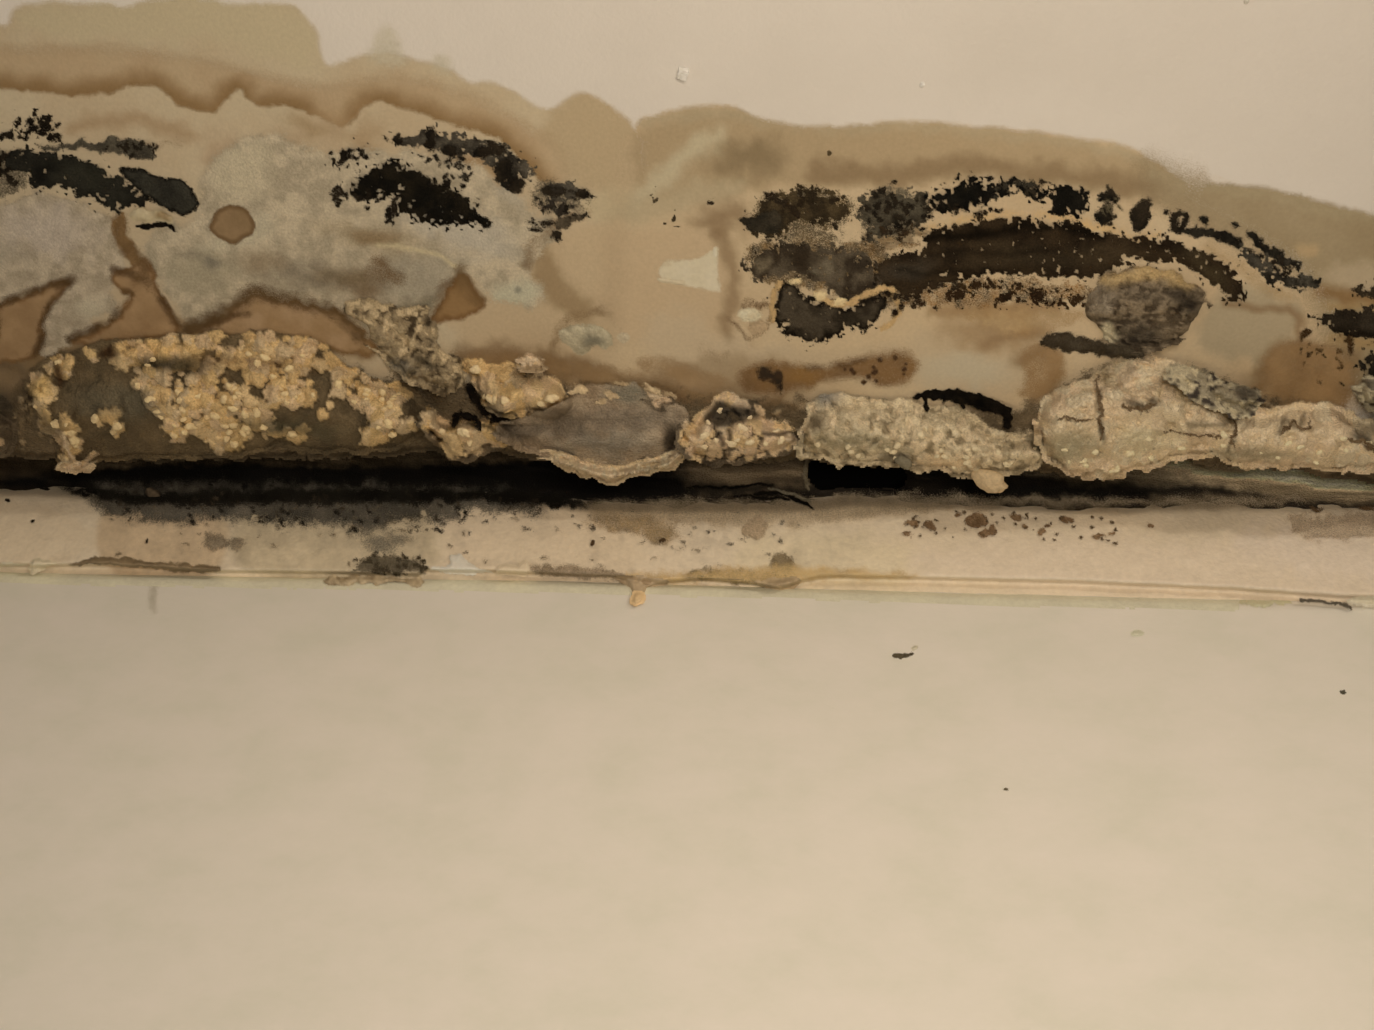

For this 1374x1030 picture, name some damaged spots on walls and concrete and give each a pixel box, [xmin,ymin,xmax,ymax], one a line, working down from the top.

leakage [0,0,1374,422]
spalling [0,297,610,475]
spalling [640,352,1374,491]
leakage [59,470,1374,588]